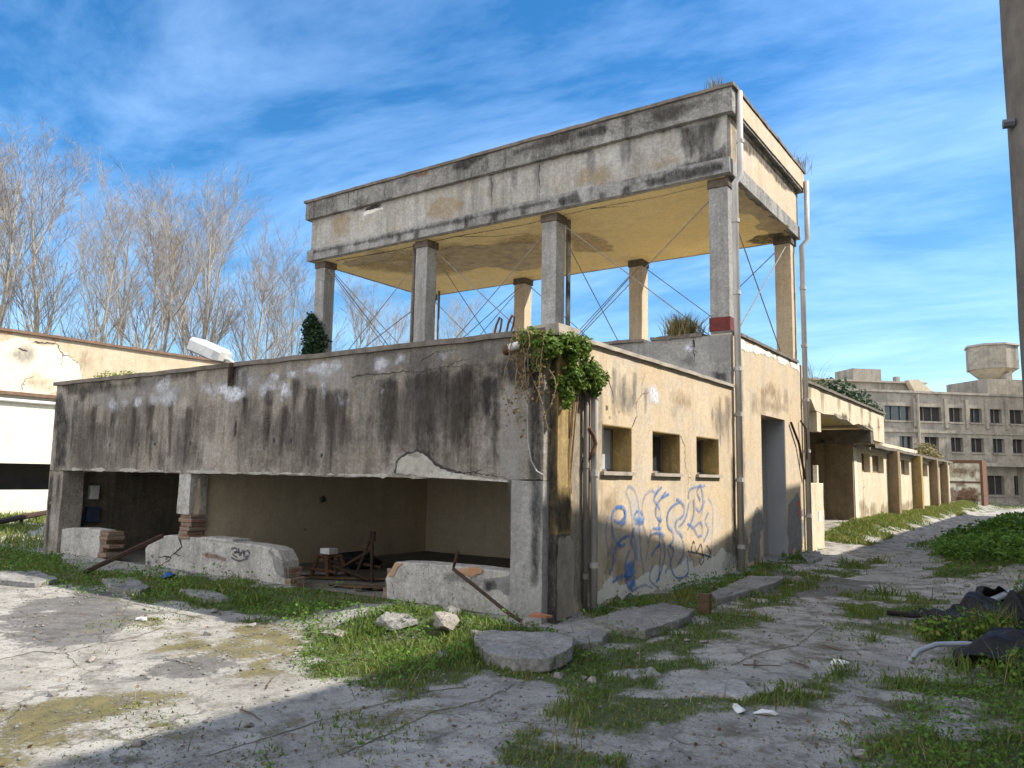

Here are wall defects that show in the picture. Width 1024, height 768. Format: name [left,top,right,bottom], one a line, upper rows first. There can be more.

water stain [454,155,483,170]
water stain [517,126,606,152]
water stain [646,105,797,194]
water stain [314,216,473,253]
peeling [0,330,83,395]
peeling [741,339,800,372]
water stain [207,360,347,448]
water stain [47,375,177,542]
spalling [177,449,509,482]
crack [160,539,182,565]